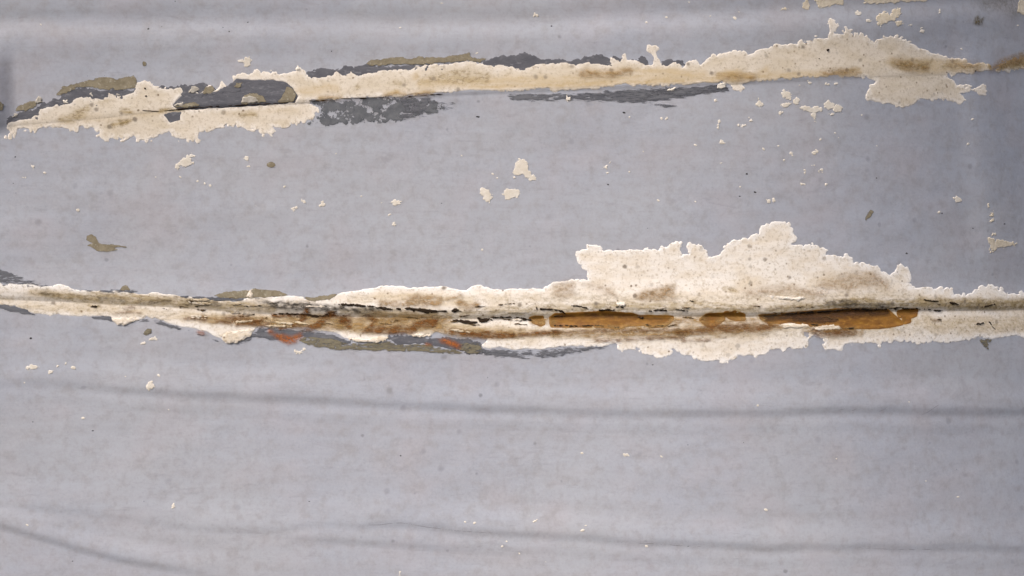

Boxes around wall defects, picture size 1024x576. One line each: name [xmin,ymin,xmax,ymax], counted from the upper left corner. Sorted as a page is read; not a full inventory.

peeling [0,0,1024,178]
peeling [480,158,536,204]
peeling [987,203,1018,253]
crack [230,297,694,328]
peeling [0,221,1024,365]
rust [184,309,889,347]
crack [754,299,996,330]